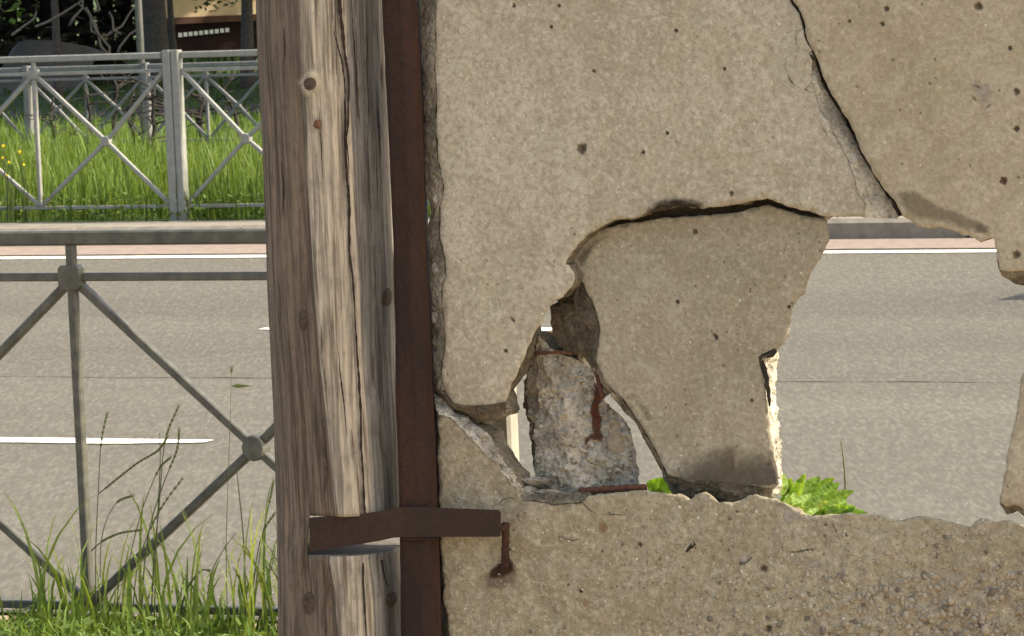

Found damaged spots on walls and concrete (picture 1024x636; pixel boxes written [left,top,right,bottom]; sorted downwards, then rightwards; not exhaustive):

spalling [420,0,647,504]
crack [607,199,821,228]
crack [788,0,902,215]
corrosion [585,383,609,454]
spalling [534,282,760,502]
corrosion [490,559,513,585]